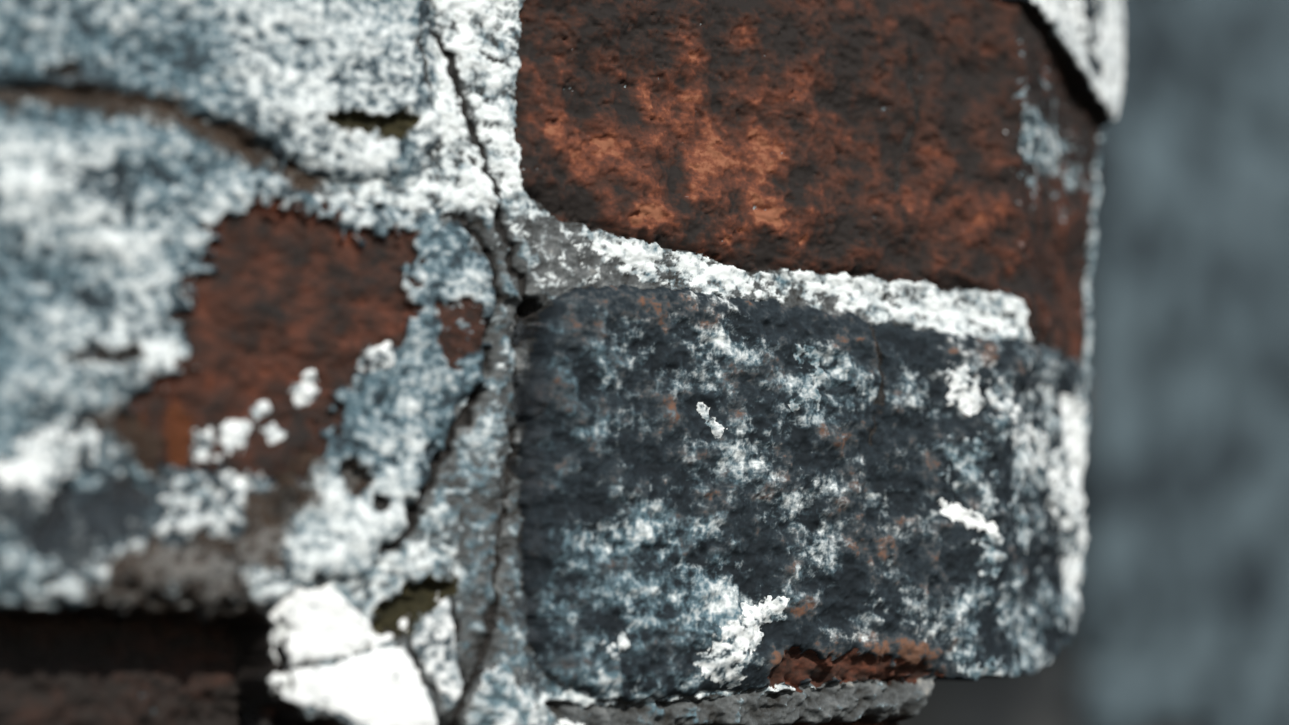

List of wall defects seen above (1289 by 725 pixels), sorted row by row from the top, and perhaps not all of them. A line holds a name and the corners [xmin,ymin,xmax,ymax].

damp [0,401,327,630]
spalling [0,195,489,539]
crack [336,0,539,725]
damp [509,321,550,572]
damp [515,588,544,692]